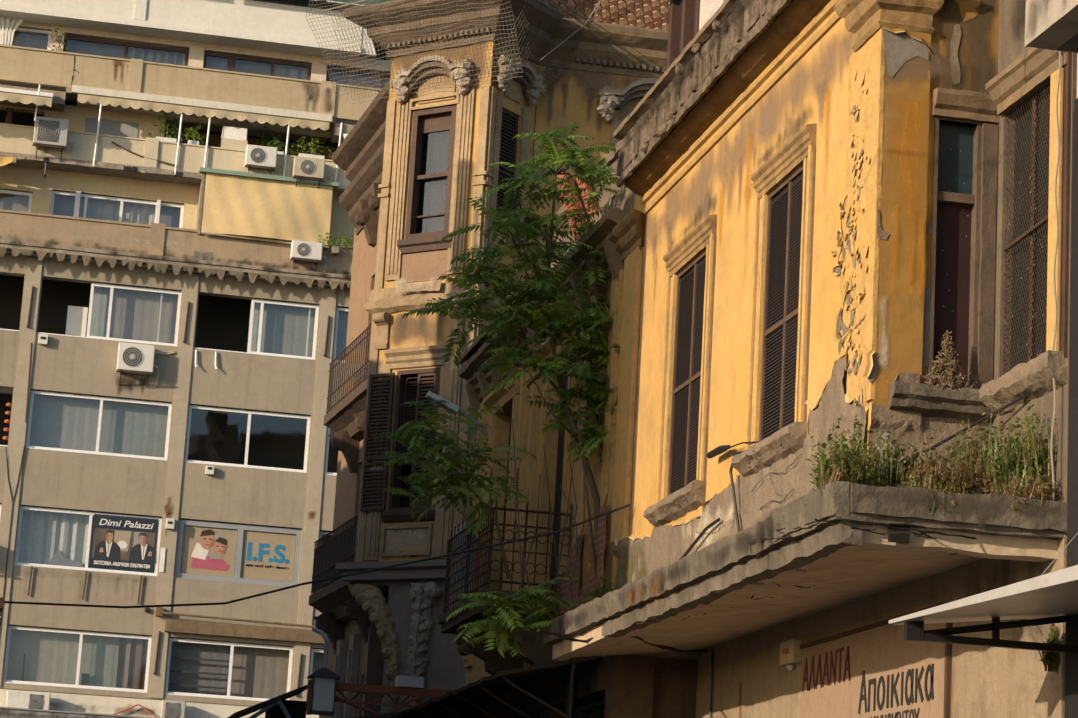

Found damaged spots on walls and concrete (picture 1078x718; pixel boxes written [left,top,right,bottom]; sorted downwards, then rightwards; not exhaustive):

water stain [497,54,658,128]
water stain [648,33,853,250]
peeling [882,0,980,84]
peeling [581,104,991,603]